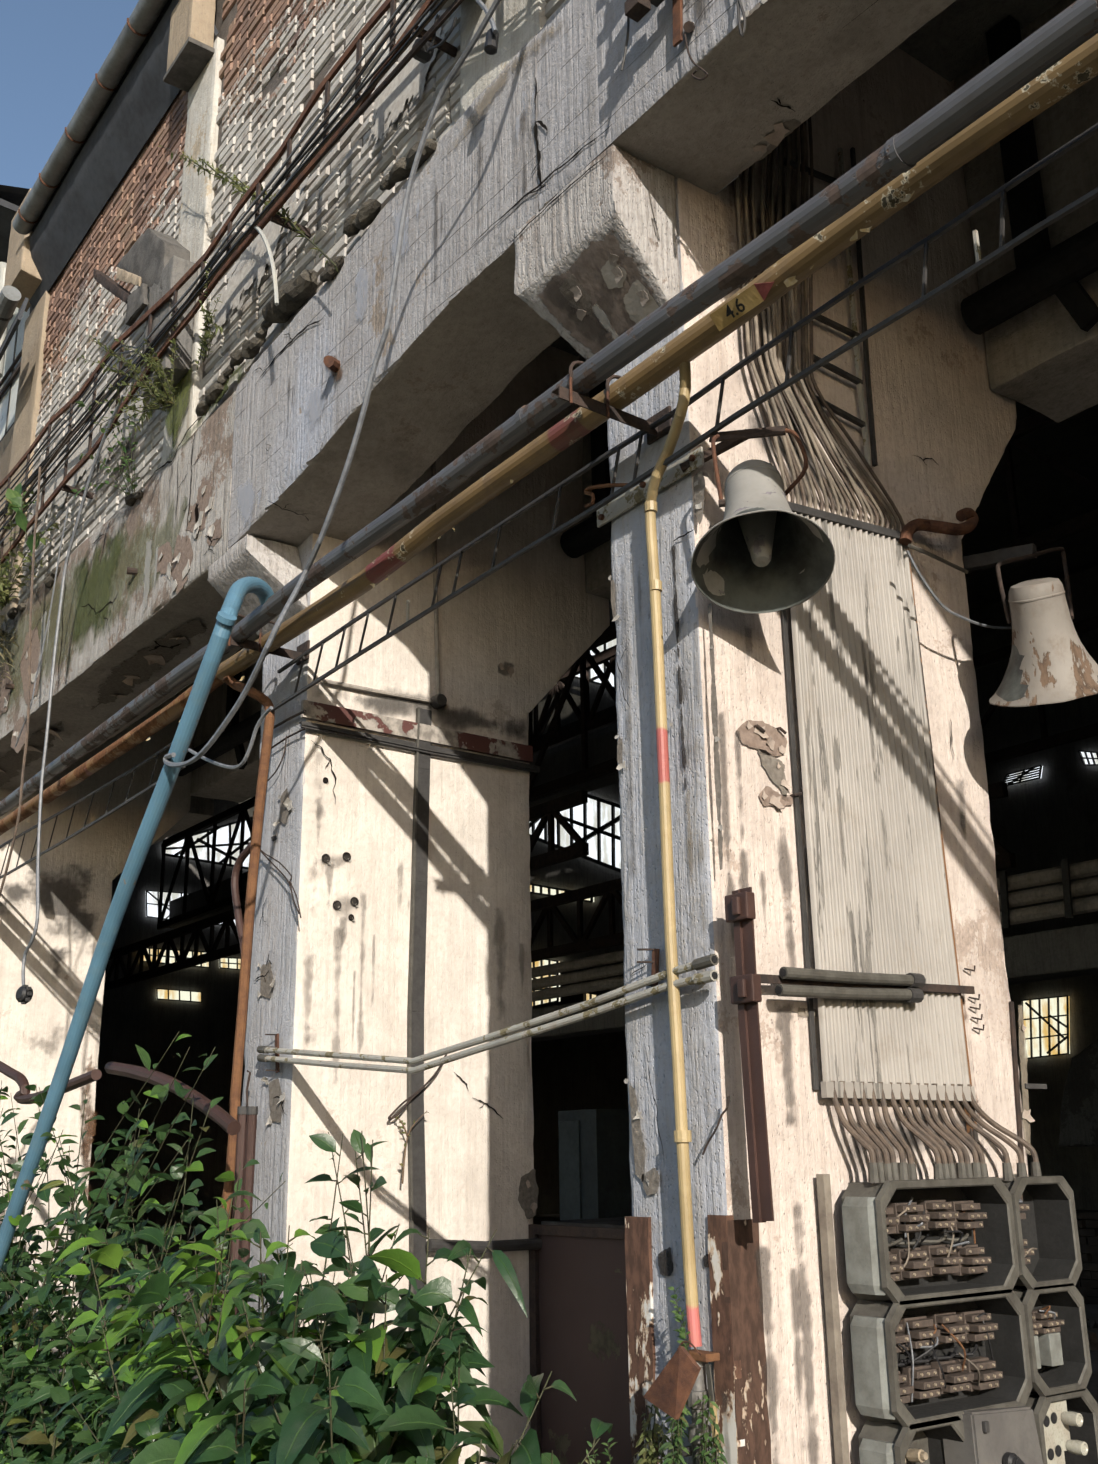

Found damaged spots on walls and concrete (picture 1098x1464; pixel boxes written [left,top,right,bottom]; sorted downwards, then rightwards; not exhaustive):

crack [472,78,611,245]
peeling [537,229,659,355]
leakage [143,541,158,612]
peeling [157,478,222,594]
rust [271,700,540,773]
spalling [708,603,803,870]